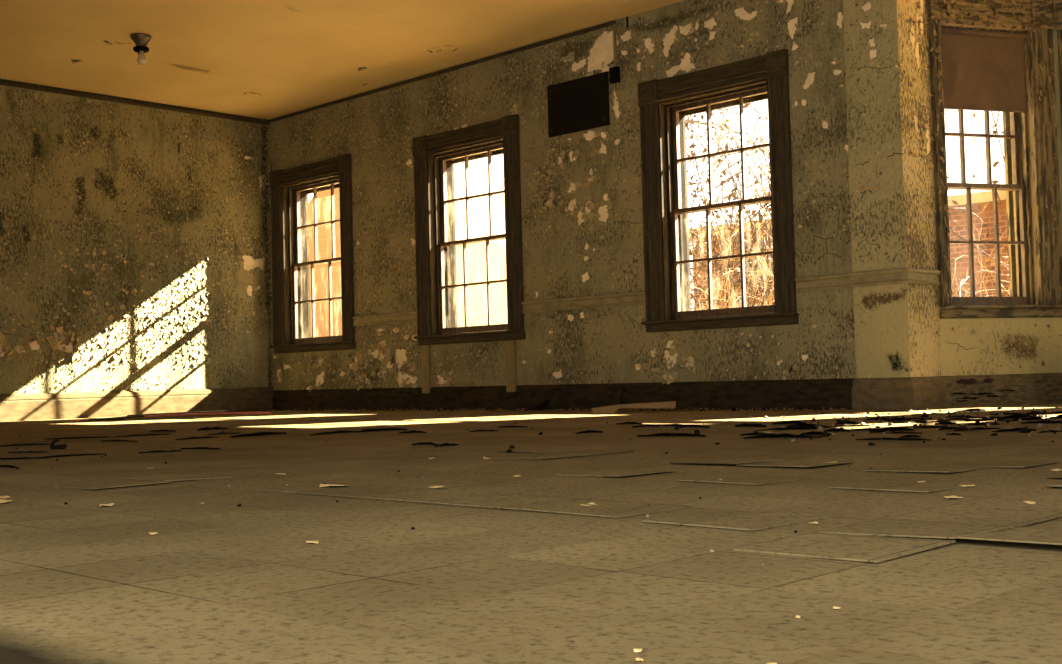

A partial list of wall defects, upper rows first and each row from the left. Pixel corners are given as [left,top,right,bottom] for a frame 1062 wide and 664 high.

peeling [561,18,720,77]
peeling [735,6,757,21]
peeling [777,0,798,50]
peeling [856,1,887,59]
peeling [909,0,933,96]
peeling [792,72,816,108]
peeling [908,111,936,223]
peeling [538,131,620,282]
damp [861,288,907,310]
peeling [0,324,98,374]
peeling [272,323,418,392]
peeling [635,335,697,384]